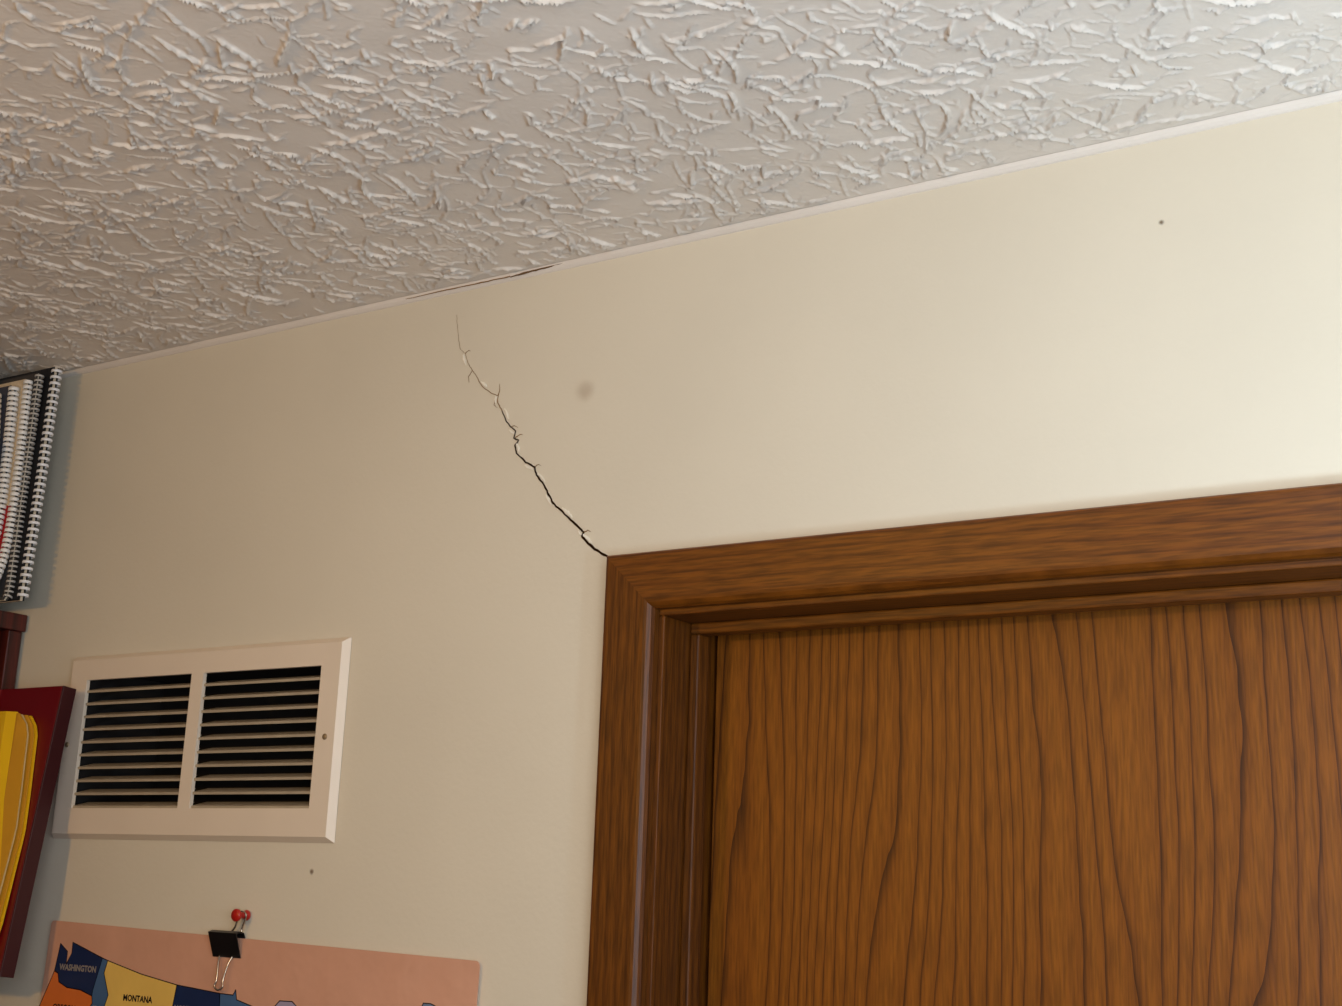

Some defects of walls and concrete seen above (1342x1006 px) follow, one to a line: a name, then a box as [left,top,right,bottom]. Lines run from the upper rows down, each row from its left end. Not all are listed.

crack [407,263,562,299]
crack [457,324,608,557]